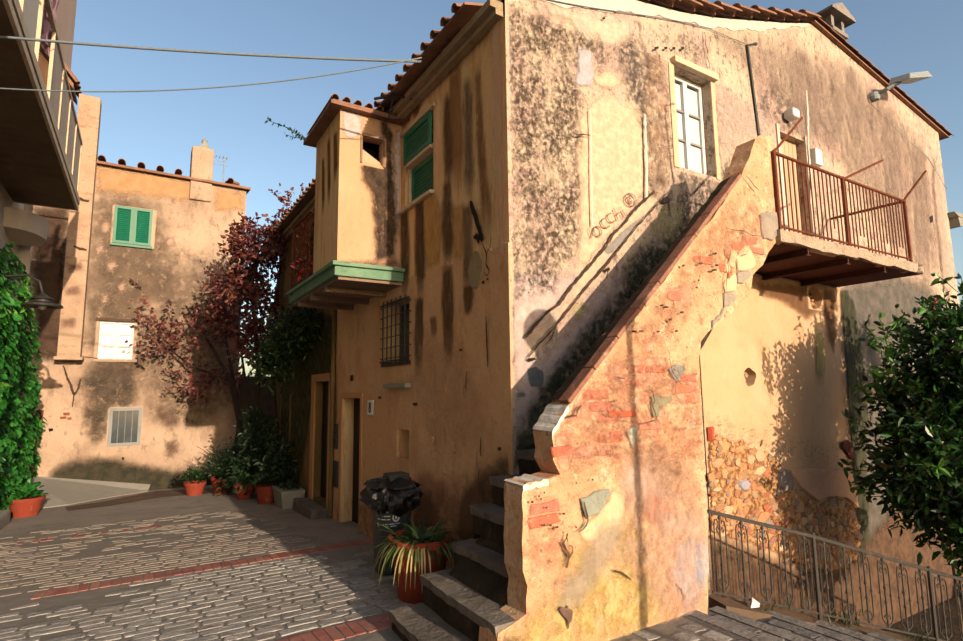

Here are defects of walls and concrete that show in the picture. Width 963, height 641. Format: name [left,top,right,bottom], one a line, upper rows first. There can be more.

leakage [33,197,227,436]
leakage [355,121,425,286]
leakage [415,69,489,368]
leakage [509,9,611,418]
leakage [618,39,728,229]
flaking render [693,234,764,328]
leakage [52,459,230,491]
flaking render [528,492,565,530]
flaking render [551,357,699,471]
spalling [842,440,855,460]